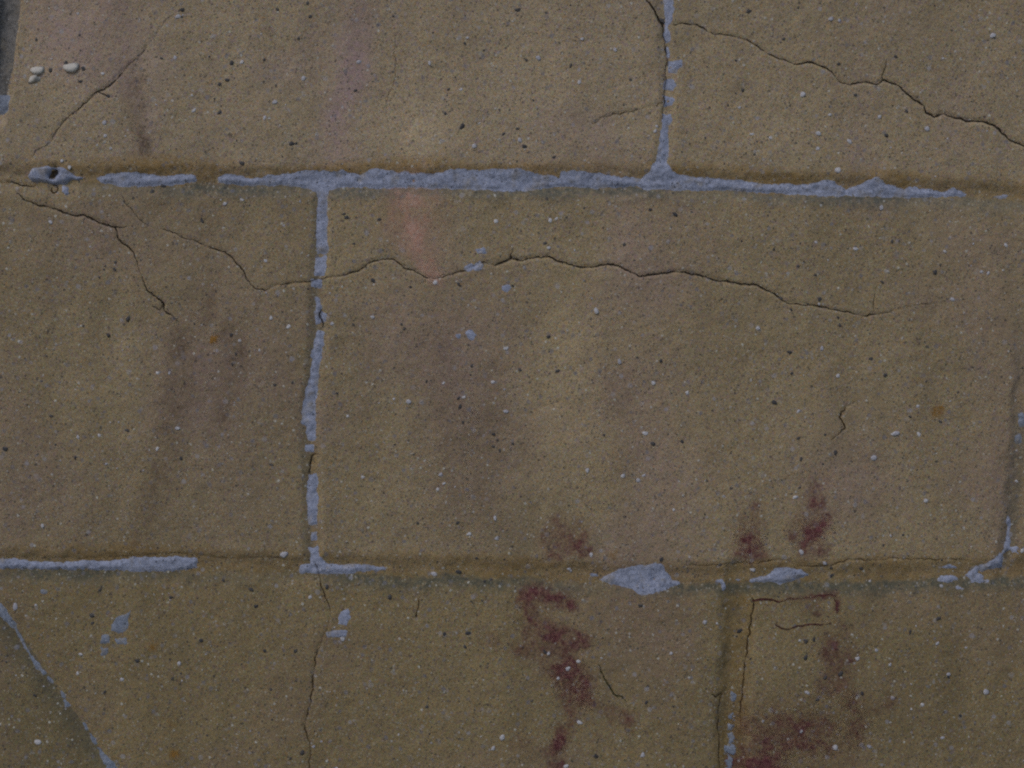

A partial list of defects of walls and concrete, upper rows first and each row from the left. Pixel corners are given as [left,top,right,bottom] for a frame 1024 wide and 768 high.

crack [594,0,1024,146]
crack [8,51,886,321]
crack [304,650,318,768]
rust [520,587,591,713]
crack [711,597,754,767]